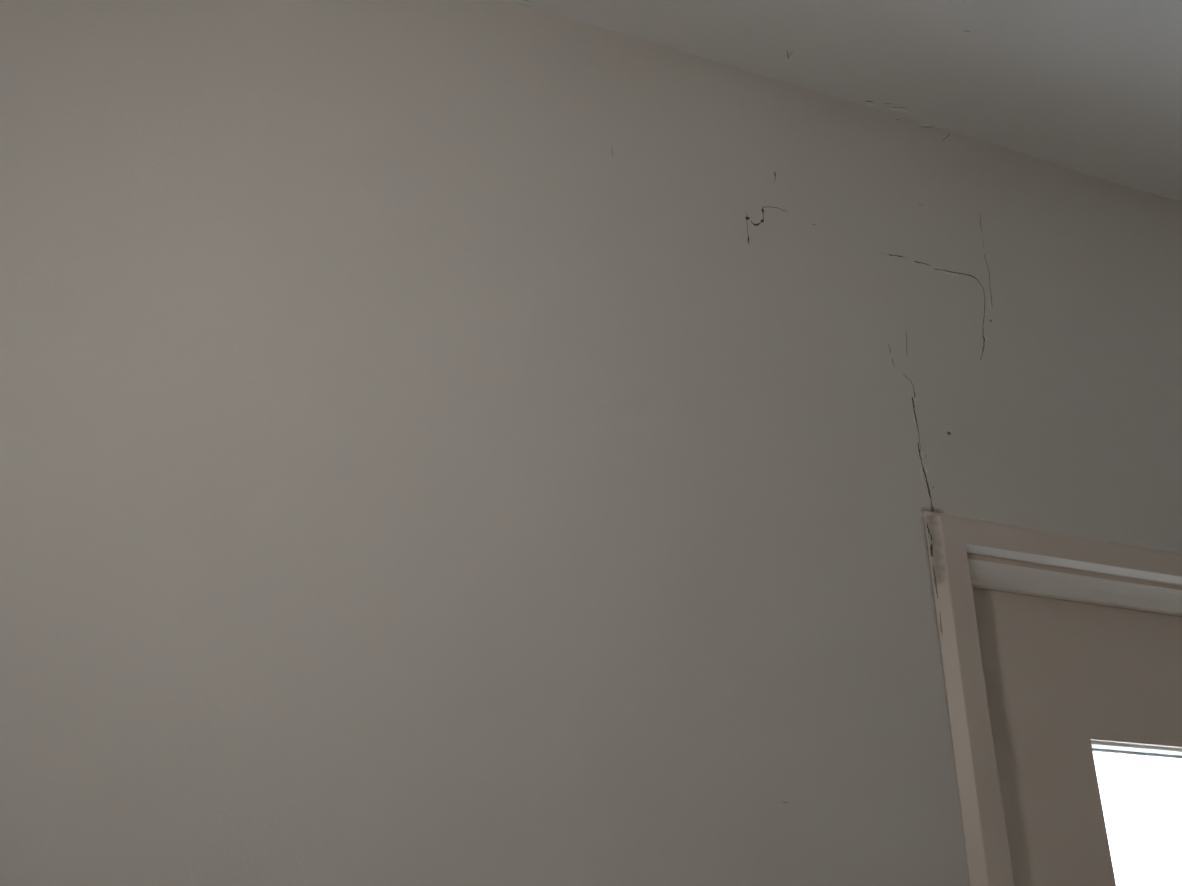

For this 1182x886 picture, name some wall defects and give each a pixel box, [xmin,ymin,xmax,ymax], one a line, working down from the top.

crack [746,171,786,244]
crack [879,213,992,358]
crack [888,333,943,635]